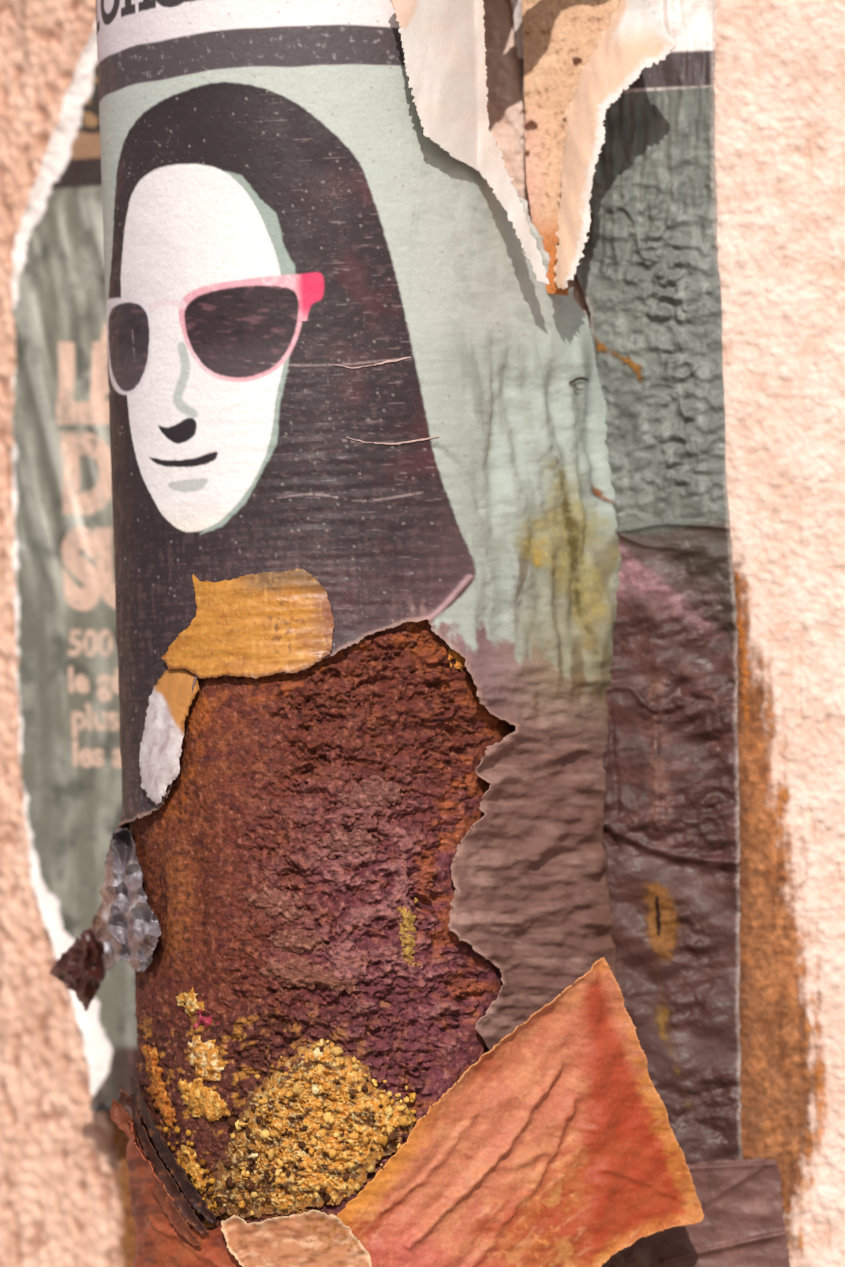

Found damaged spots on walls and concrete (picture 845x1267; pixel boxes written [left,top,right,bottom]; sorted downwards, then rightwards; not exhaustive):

corrosion [107,620,511,1267]